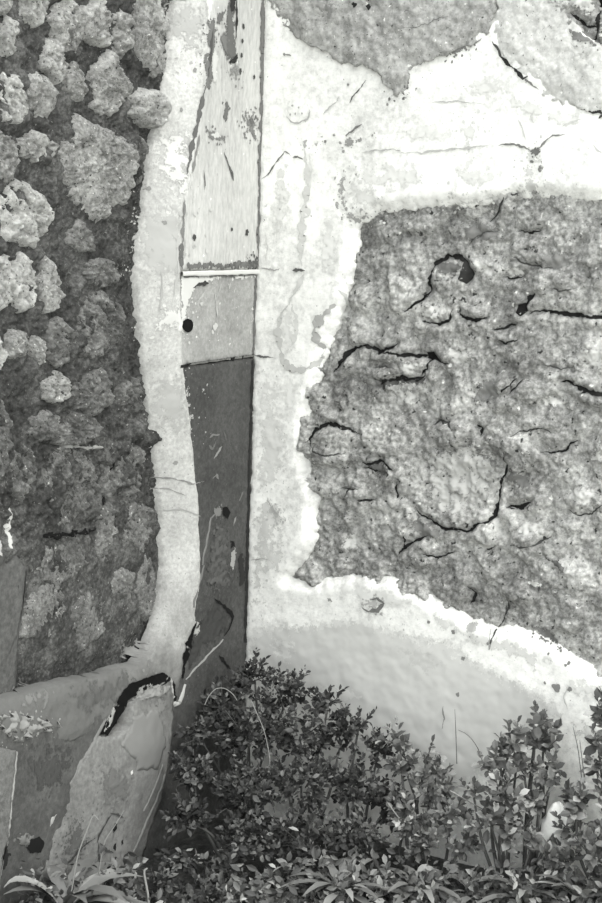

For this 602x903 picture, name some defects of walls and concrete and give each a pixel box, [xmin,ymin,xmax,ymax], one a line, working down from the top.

spalling [193,0,245,89]
crack [492,42,538,89]
spalling [561,0,602,68]
crack [363,109,602,155]
spalling [437,210,524,284]
crack [404,197,602,345]
crack [334,343,448,385]
spalling [374,338,477,414]
crack [543,364,602,396]
crack [309,421,578,559]
flaking render [398,425,534,543]
spalling [518,613,581,667]